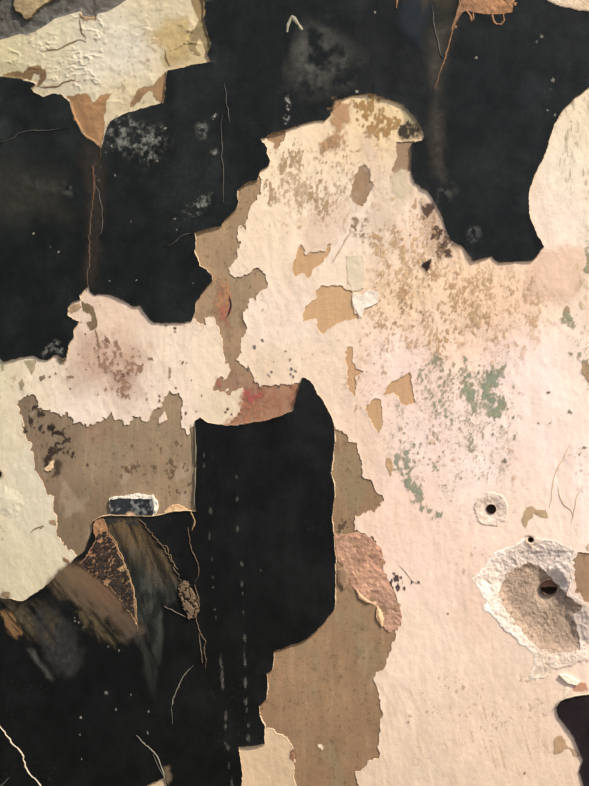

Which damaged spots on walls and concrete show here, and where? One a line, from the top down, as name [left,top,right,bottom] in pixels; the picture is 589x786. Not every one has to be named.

spalling [548,0,589,11]
peeling [0,0,211,149]
peeling [109,493,159,517]
peeling [96,516,140,526]
peeling [567,578,589,605]
peeling [572,682,588,692]
crack [0,726,41,786]
peeling [239,728,297,786]
peeling [554,736,569,754]